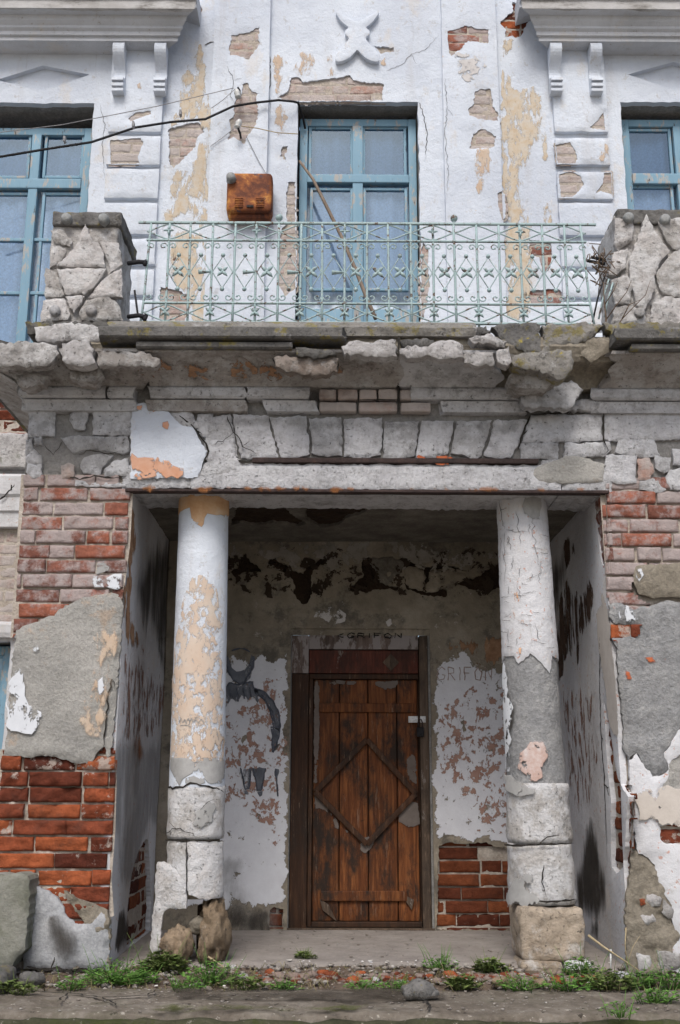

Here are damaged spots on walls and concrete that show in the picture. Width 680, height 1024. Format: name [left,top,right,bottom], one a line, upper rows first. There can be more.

peeling [159,44,211,321]
peeling [228,26,680,414]
crack [179,415,256,475]
flaking render [0,454,288,846]
water stain [553,567,563,605]
flaking render [0,747,117,970]
flaking render [436,683,510,931]
flaking render [608,721,638,870]
flaking render [660,824,680,844]
flaking render [662,755,680,789]